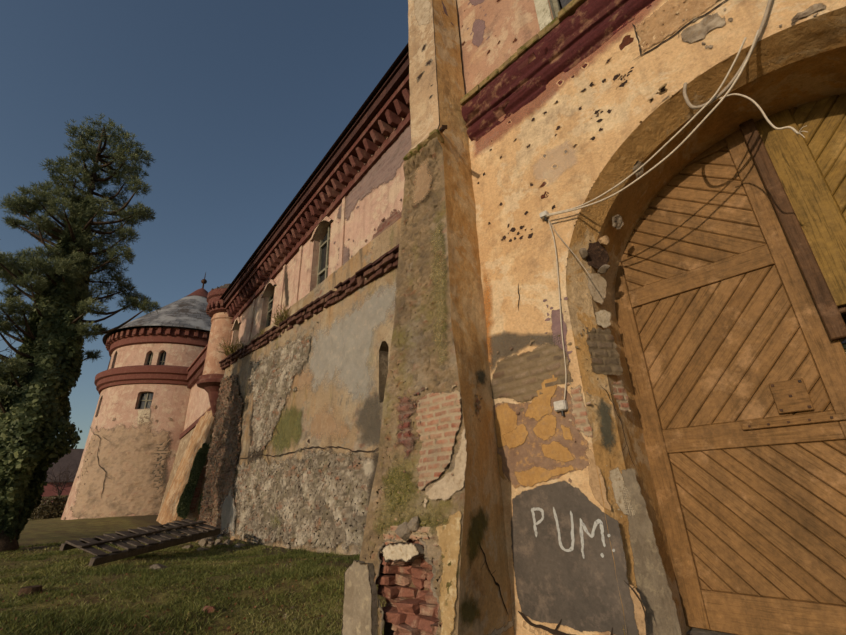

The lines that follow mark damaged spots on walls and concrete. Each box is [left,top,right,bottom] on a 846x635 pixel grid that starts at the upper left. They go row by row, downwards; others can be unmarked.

peeling [442,0,501,57]
spalling [681,8,733,49]
peeling [337,127,411,223]
peeling [489,240,635,518]
crack [90,427,110,495]
flaking render [395,384,461,507]
spalling [341,518,440,635]
crack [480,546,575,635]